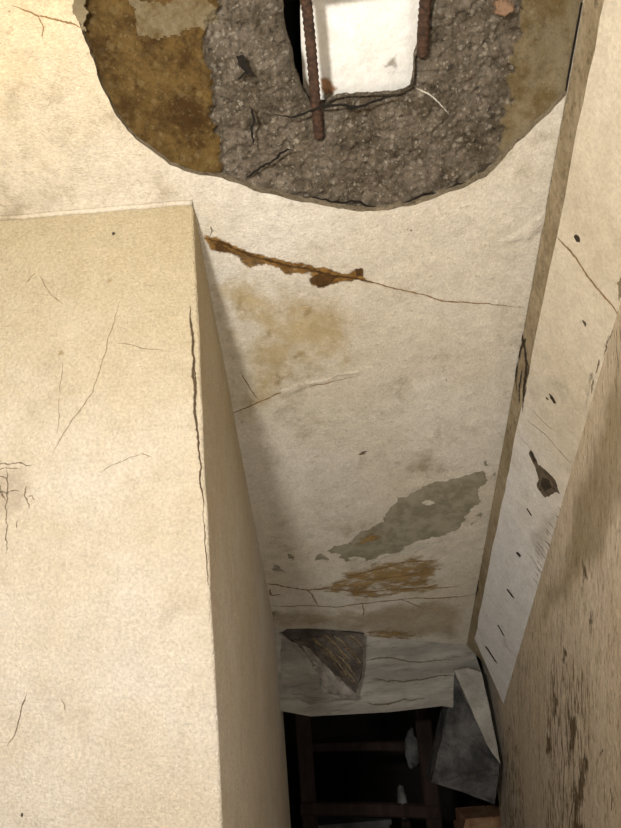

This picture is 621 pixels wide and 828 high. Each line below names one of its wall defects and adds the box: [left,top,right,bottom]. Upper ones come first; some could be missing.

spalling [72,0,581,207]
corrosion [321,79,335,94]
corrosion [205,226,377,288]
crack [366,280,511,307]
crack [233,372,281,413]
crack [189,307,208,582]
peeling [529,450,560,497]
crack [0,462,35,553]
peeling [314,461,495,564]
crack [282,589,474,616]